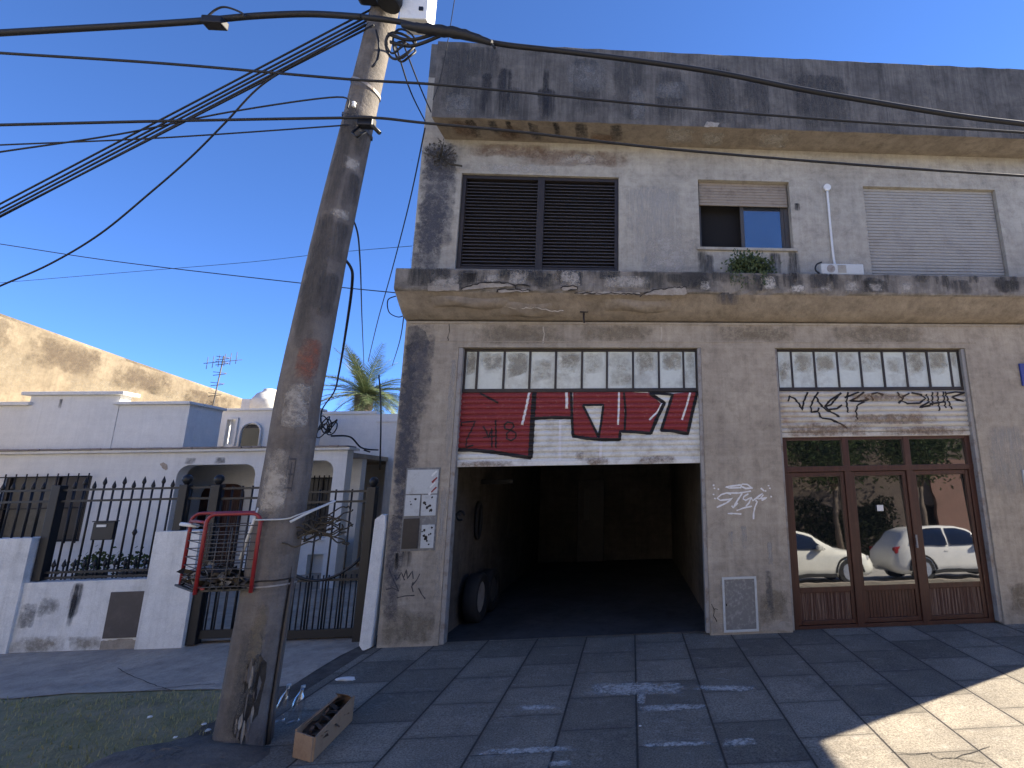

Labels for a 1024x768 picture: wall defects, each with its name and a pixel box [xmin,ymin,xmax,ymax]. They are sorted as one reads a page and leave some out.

leakage [538,72,559,134]
leakage [410,144,734,303]
spalling [428,281,529,293]
spalling [561,286,687,296]
leakage [747,253,889,292]
leakage [903,275,978,290]
leakage [996,276,1019,290]
leakage [385,334,433,639]
leakage [69,584,83,622]